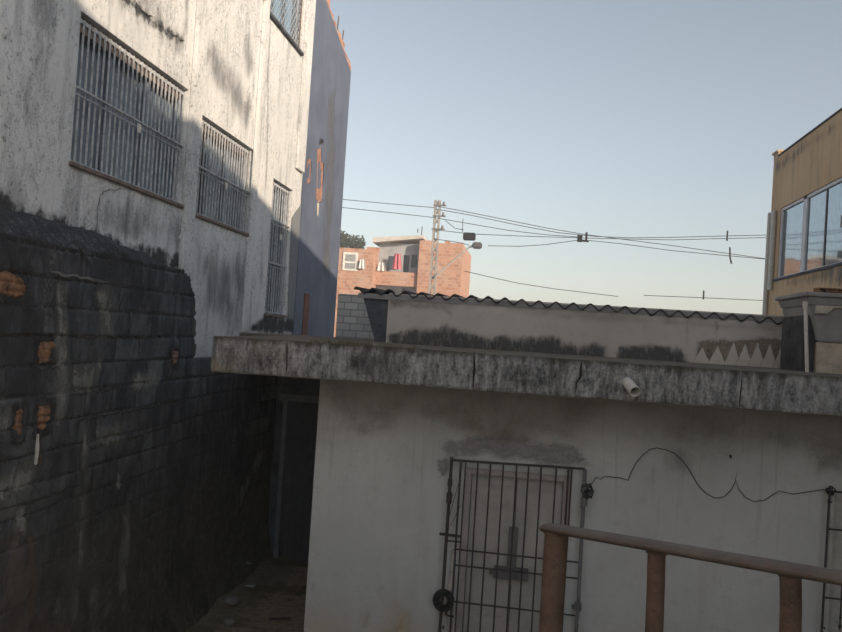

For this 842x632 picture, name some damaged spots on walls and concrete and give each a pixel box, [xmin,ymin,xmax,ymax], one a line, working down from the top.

spalling [0,262,32,308]
spalling [31,334,59,372]
spalling [9,396,56,448]